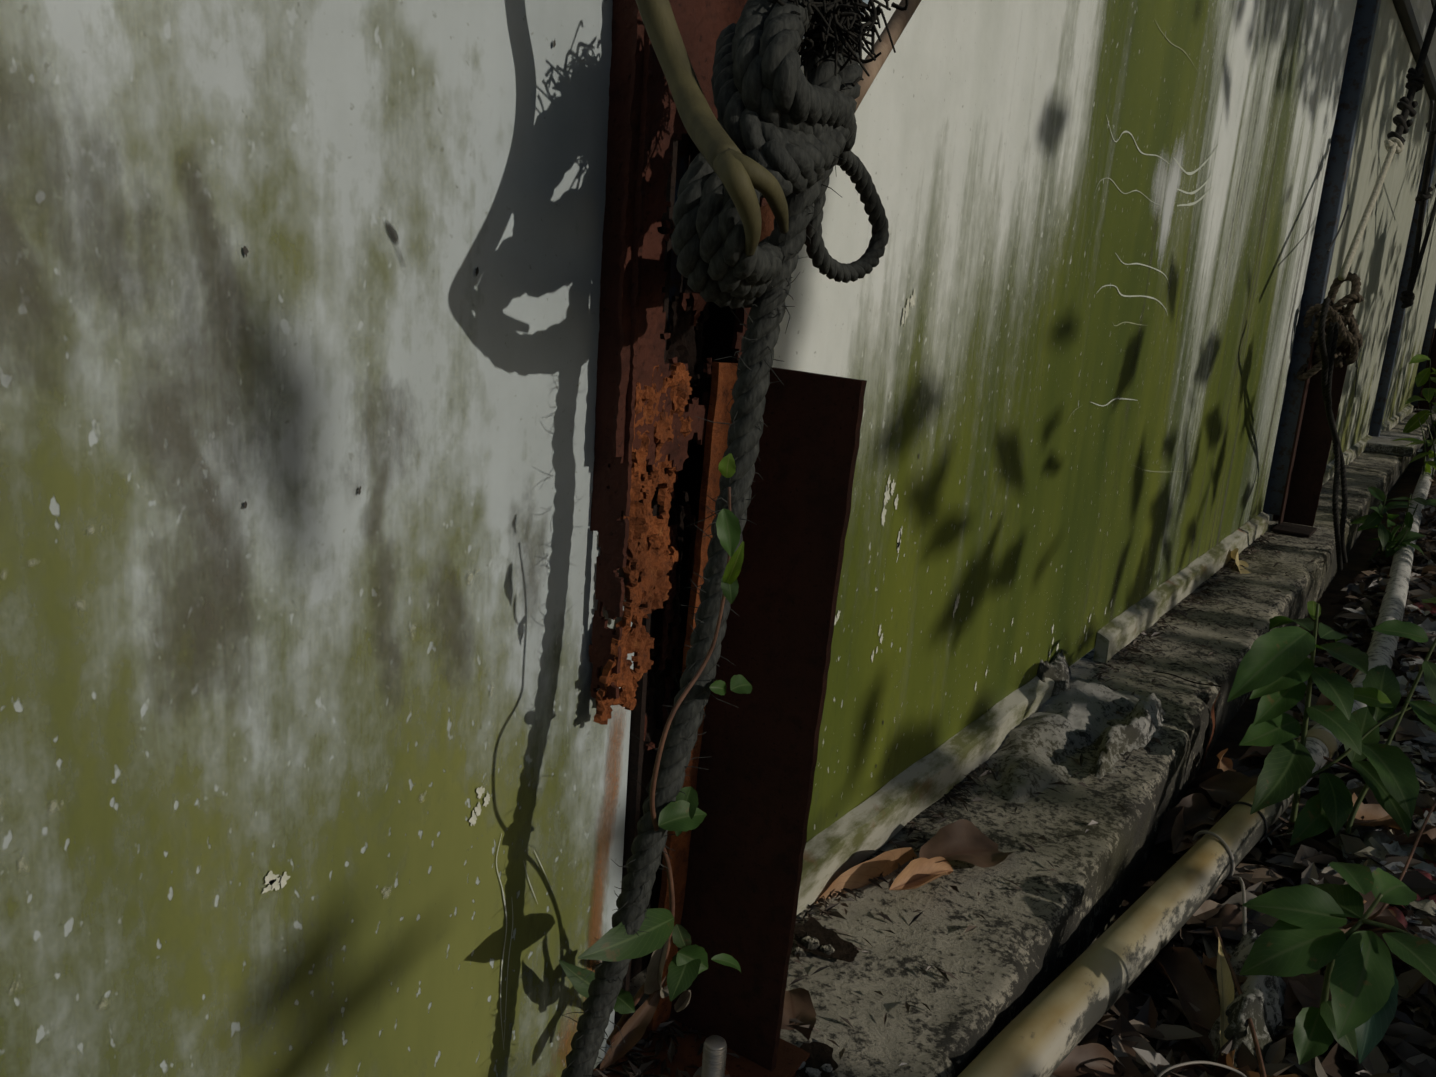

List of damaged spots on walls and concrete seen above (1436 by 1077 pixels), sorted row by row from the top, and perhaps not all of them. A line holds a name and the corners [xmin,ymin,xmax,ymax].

corrosion [669,0,748,119]
damp [188,172,248,372]
damp [387,222,398,243]
damp [1255,175,1319,513]
damp [142,373,247,666]
corrosion [589,0,711,973]
peeling [262,871,290,894]